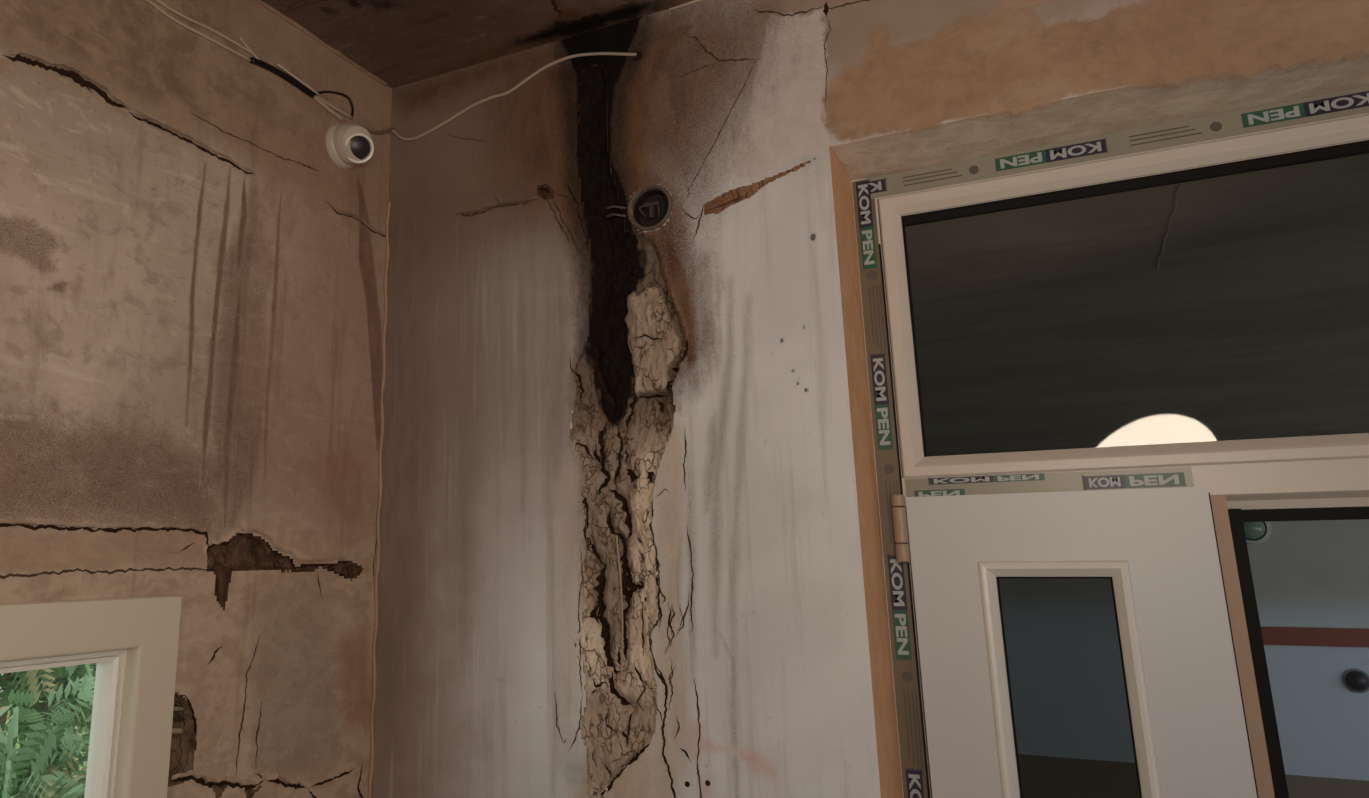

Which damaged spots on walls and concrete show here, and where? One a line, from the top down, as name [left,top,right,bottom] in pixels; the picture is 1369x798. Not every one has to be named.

crack [3,49,387,237]
crack [754,0,869,106]
crack [0,517,213,579]
water stain [0,162,283,565]
water stain [356,174,783,798]
flaking render [569,64,816,798]
crack [171,635,363,798]